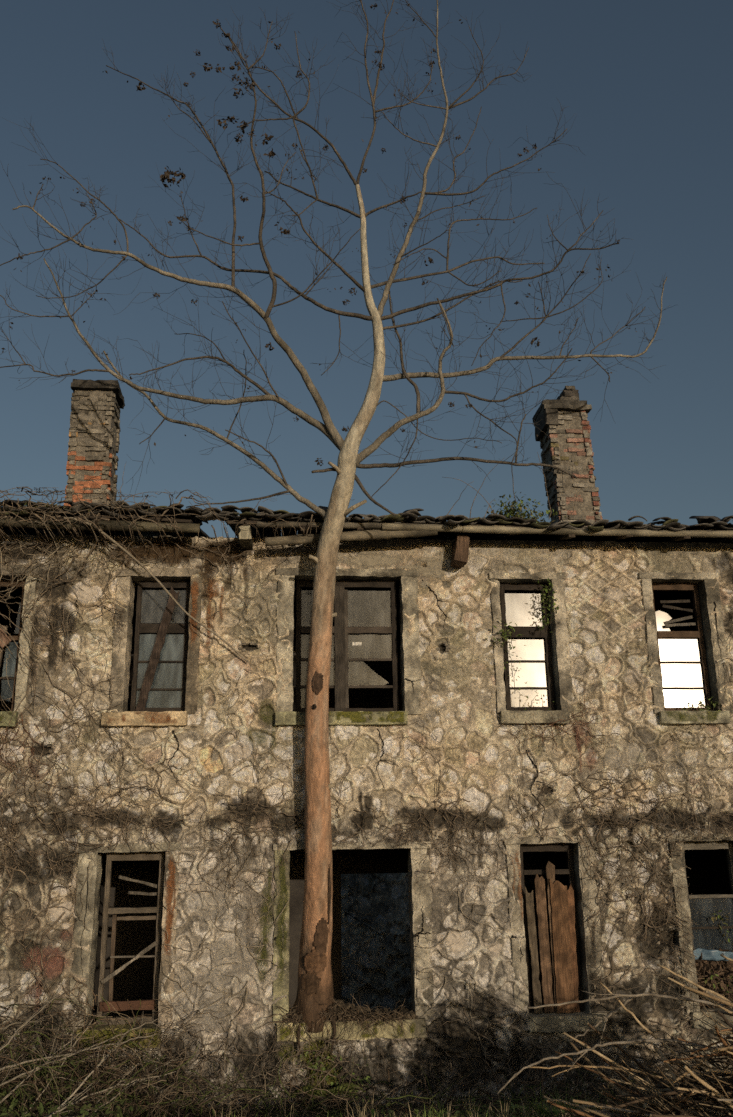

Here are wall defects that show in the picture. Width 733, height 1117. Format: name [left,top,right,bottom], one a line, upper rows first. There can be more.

leakage [711,554,733,584]
leakage [724,600,733,633]
leakage [206,796,300,860]
leakage [351,792,374,832]
rust [165,860,176,952]
leakage [231,1029,283,1099]
leakage [328,986,547,1093]